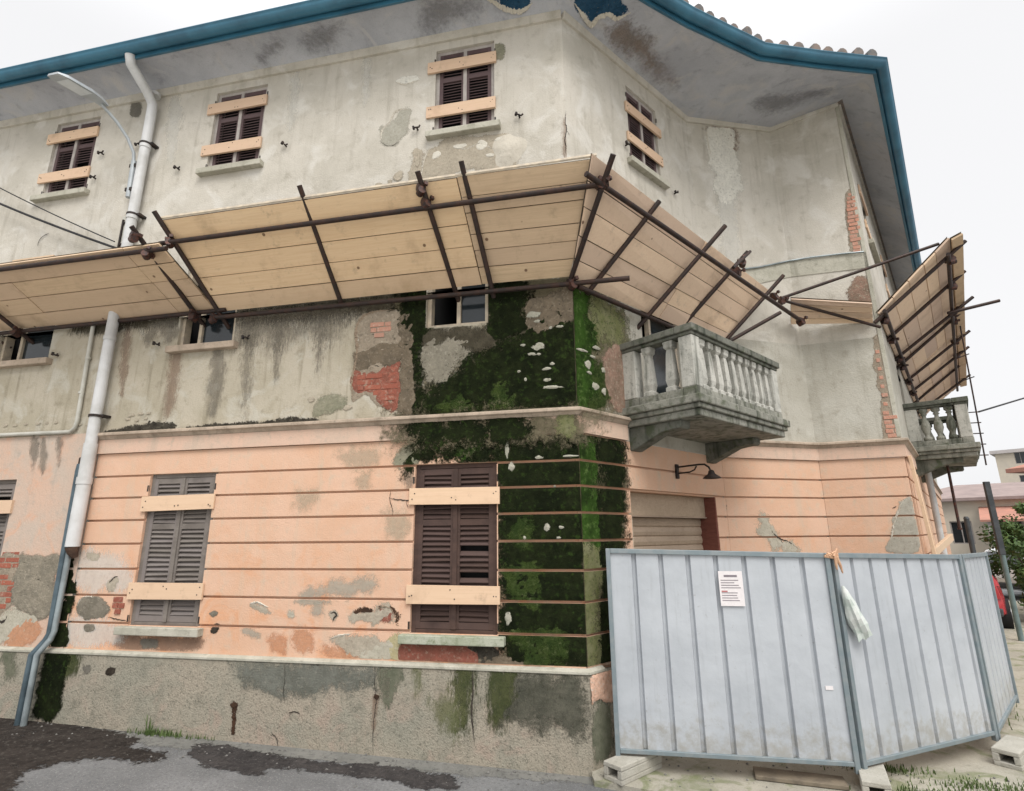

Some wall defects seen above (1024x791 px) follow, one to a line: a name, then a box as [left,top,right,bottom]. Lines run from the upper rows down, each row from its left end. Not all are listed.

crack [562,114,570,157]
flaking render [845,189,861,252]
leakage [235,293,401,332]
leakage [69,317,179,396]
peeling [308,309,474,416]
leakage [521,342,562,389]
leakage [576,345,606,395]
flaking render [872,334,901,439]
peeling [0,552,60,647]
flaking render [242,575,531,666]
leakage [228,662,421,709]
corrosion [230,702,238,735]